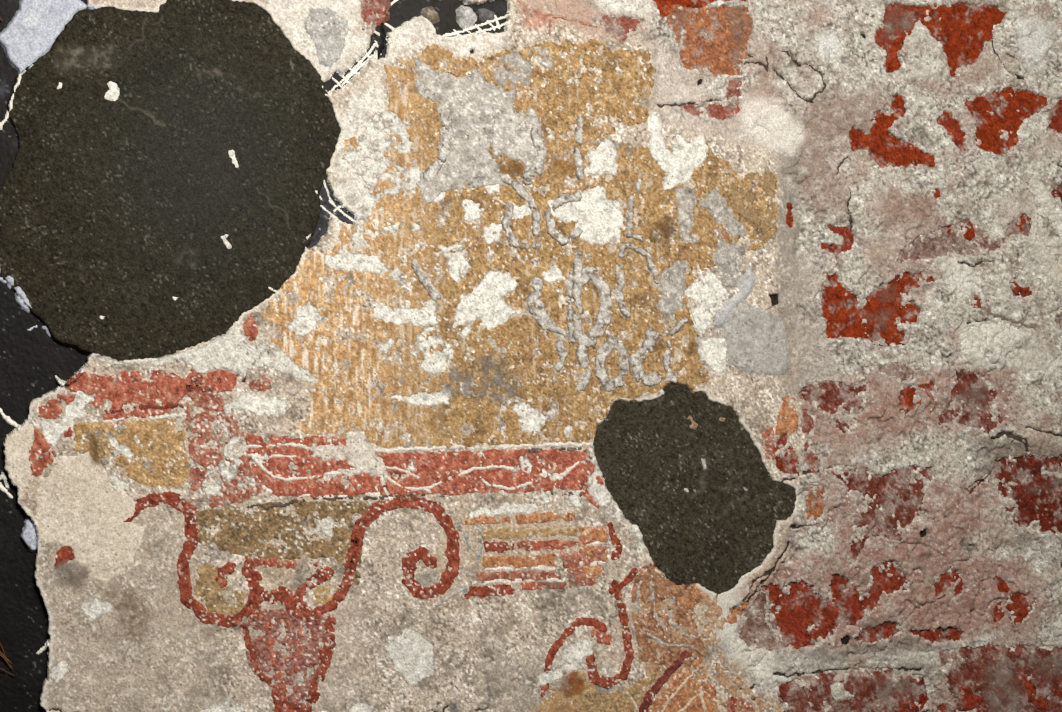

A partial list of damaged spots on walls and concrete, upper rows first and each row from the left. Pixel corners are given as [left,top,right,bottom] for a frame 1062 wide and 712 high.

spalling [322,0,511,96]
spalling [653,0,758,121]
crack [742,51,826,103]
spalling [849,95,935,168]
spalling [861,0,1008,77]
spalling [937,86,1062,156]
flaking render [306,46,553,409]
spalling [821,213,1037,346]
spalling [774,361,1003,562]
spalling [965,452,1062,536]
crack [991,426,1062,452]
flaking render [738,560,1062,712]